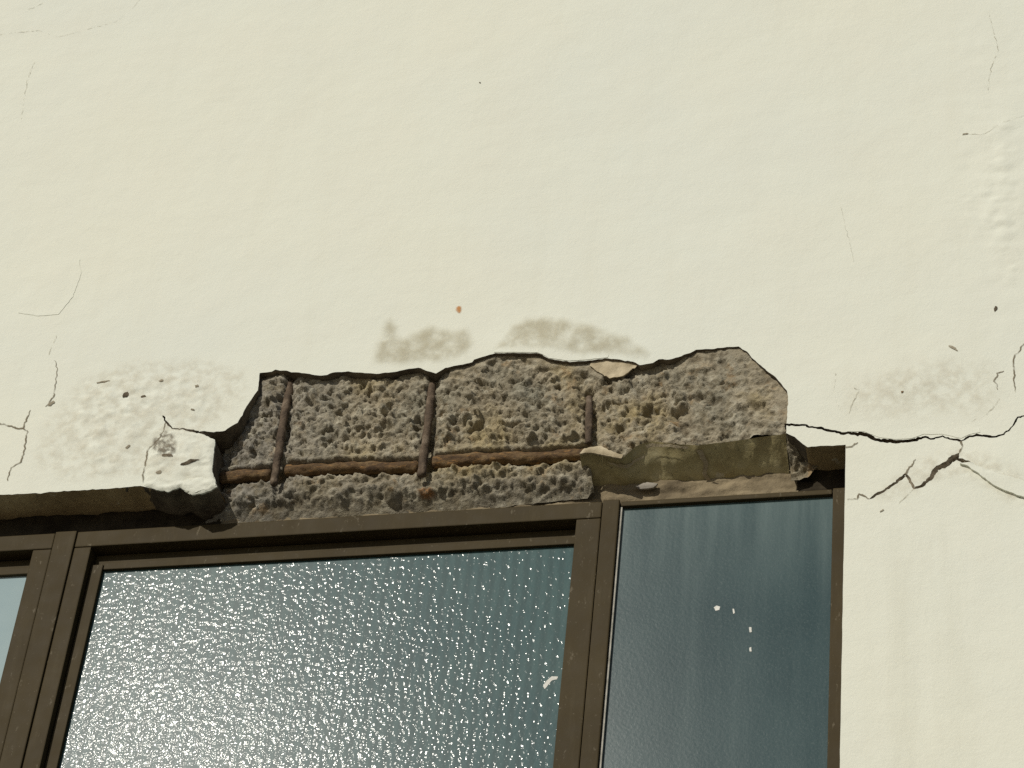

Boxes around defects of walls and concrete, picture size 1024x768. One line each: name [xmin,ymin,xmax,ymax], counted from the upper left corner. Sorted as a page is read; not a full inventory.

crack [0,351,58,481]
spalling [144,345,818,523]
crack [784,415,1024,502]
crack [991,344,1024,410]